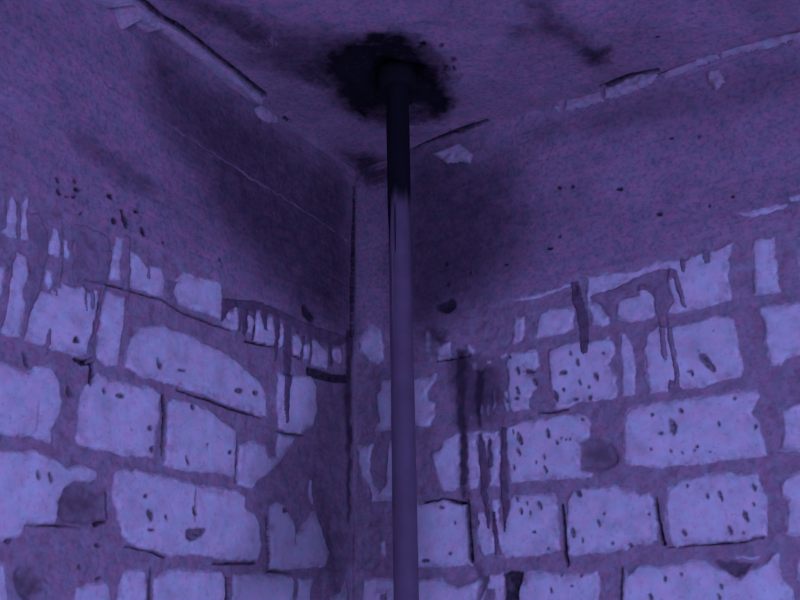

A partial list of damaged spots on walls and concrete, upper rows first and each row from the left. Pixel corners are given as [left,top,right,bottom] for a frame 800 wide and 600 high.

flaking render [551,31,800,113]
flaking render [254,105,279,124]
flaking render [433,143,473,164]
water stain [673,258,687,308]
water stain [571,281,589,354]
water stain [658,311,682,393]
spalling [700,354,716,372]
crack [160,391,259,446]
water stain [221,298,353,514]
water stain [457,352,509,555]
spalling [186,529,204,541]
spalling [718,561,752,577]